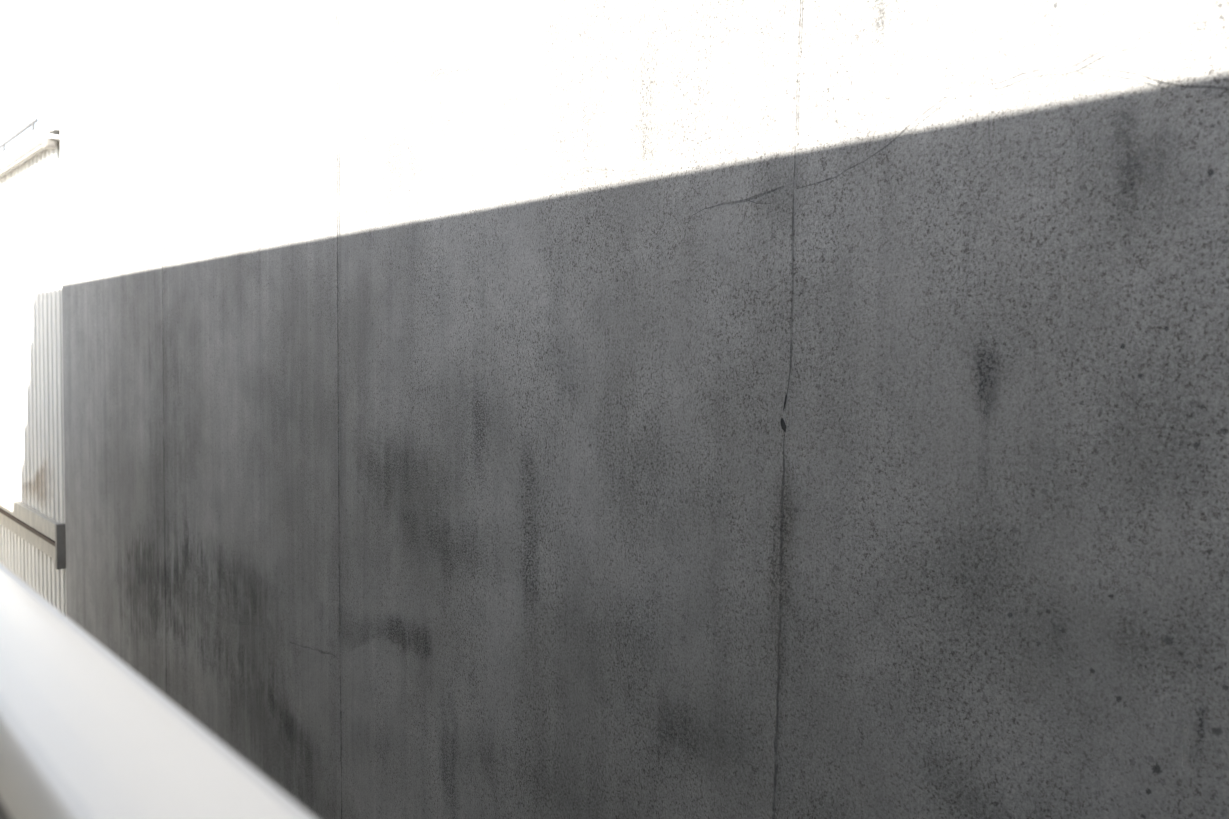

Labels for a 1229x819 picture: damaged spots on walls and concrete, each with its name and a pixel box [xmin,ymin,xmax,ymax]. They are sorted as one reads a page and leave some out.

crack [791,106,933,312]
crack [785,345,793,393]
crack [773,601,781,809]